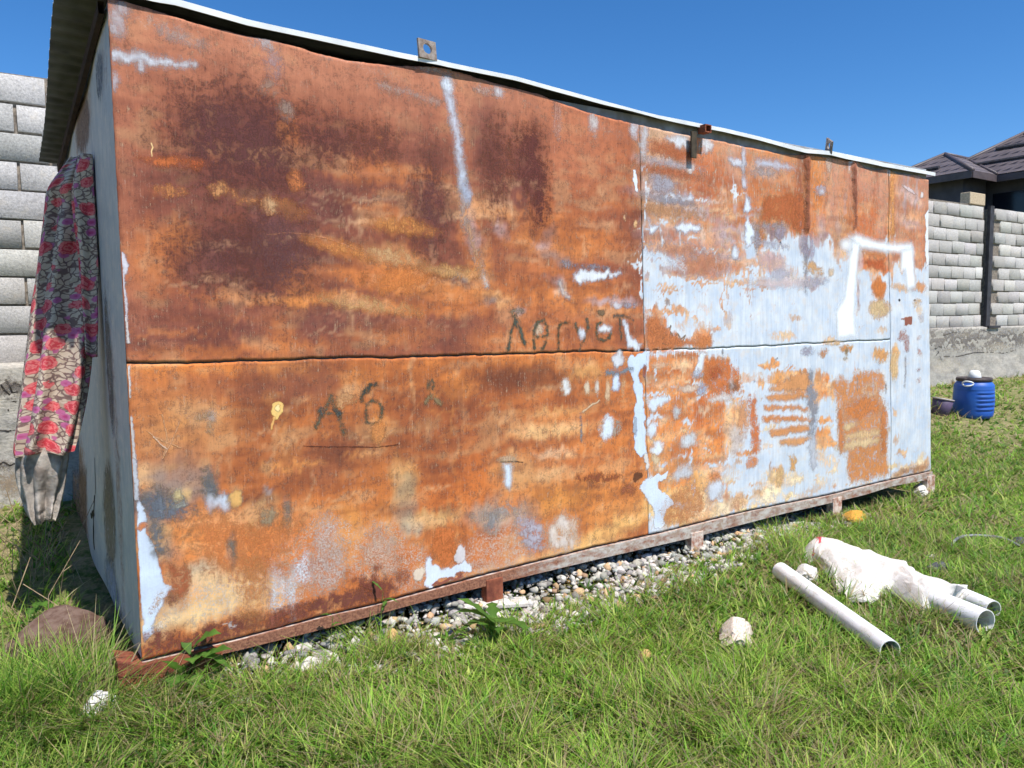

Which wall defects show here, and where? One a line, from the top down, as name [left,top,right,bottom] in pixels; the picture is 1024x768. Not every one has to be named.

rust [146,80,484,316]
rust [482,113,551,230]
peeling [666,135,714,173]
peeling [728,147,754,259]
peeling [902,185,929,267]
peeling [122,252,130,344]
peeling [679,351,732,402]
rust [104,468,119,610]
peeling [130,417,172,641]
rust [125,491,410,657]
rust [431,525,464,586]
rust [577,472,643,496]